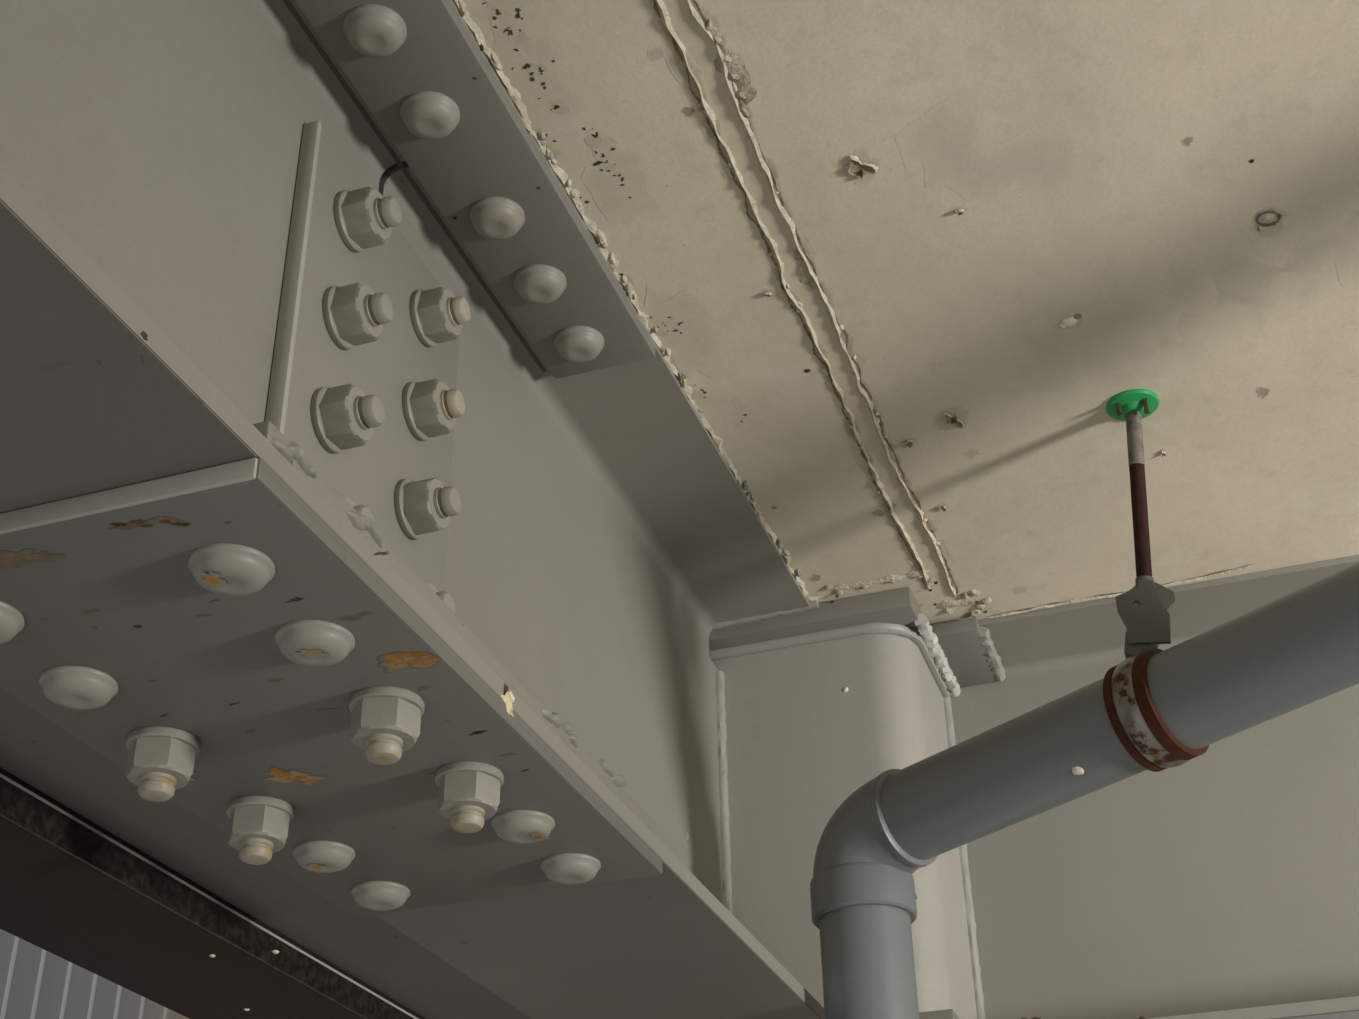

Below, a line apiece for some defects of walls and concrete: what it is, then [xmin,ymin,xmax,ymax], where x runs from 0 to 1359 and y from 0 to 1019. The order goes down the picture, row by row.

spalling [839,148,881,187]
spalling [453,0,809,597]
corrosion [378,651,440,673]
corrosion [261,767,327,786]